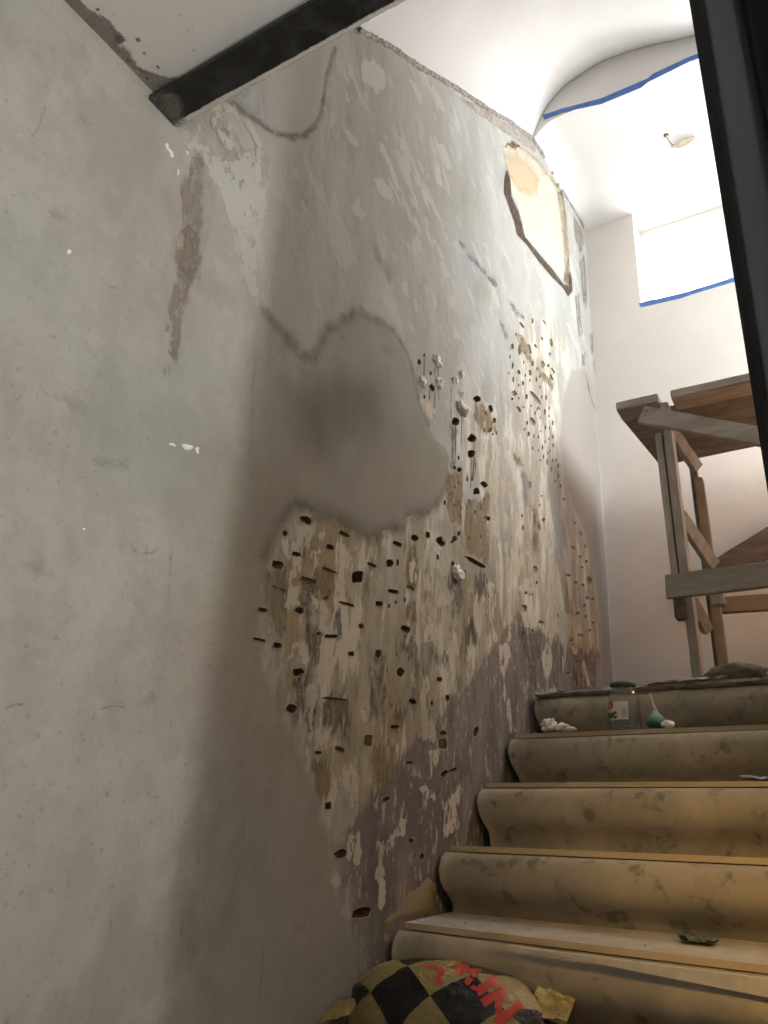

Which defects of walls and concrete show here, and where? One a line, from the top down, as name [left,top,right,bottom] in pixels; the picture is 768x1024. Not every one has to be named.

peeling [348,57,385,94]
flaking render [359,27,596,411]
leakage [250,312,462,556]
leakage [533,510,541,552]
leakage [447,572,489,618]
peeling [387,324,768,837]
peeling [270,515,378,808]
leakage [460,620,478,664]
leakage [293,676,348,733]
peeling [329,831,362,890]
flaking render [350,815,437,930]